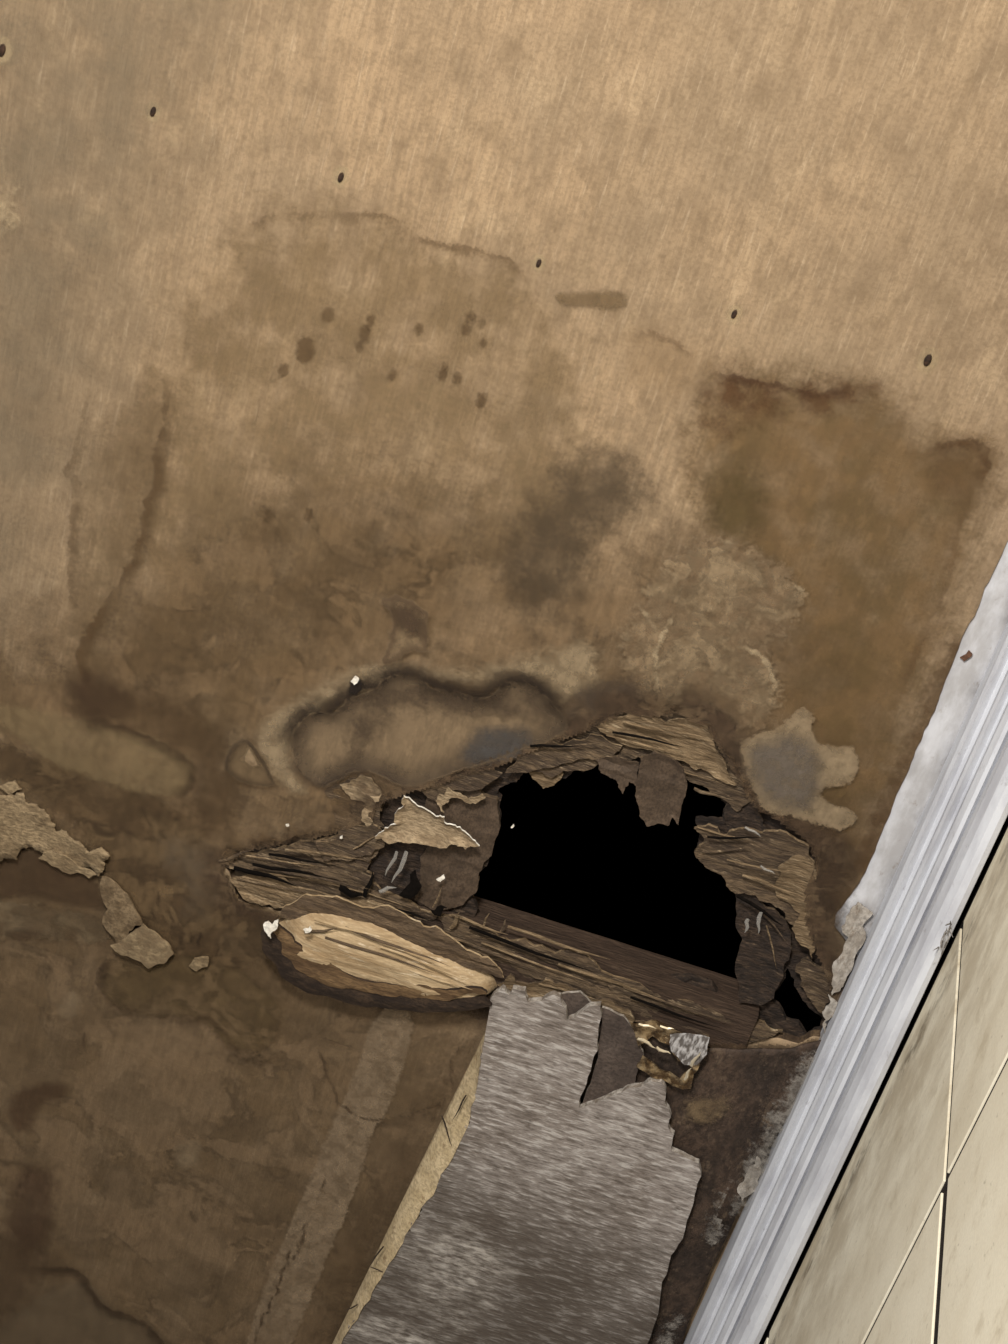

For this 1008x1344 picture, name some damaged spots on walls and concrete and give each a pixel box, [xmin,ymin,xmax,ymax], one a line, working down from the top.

damp [279,338,314,375]
damp [555,291,626,308]
spalling [224,594,596,850]
peeling [0,780,174,969]
peeling [189,956,209,971]
peeling [263,920,278,938]
damp [0,374,991,1344]
spalling [332,1030,486,1344]